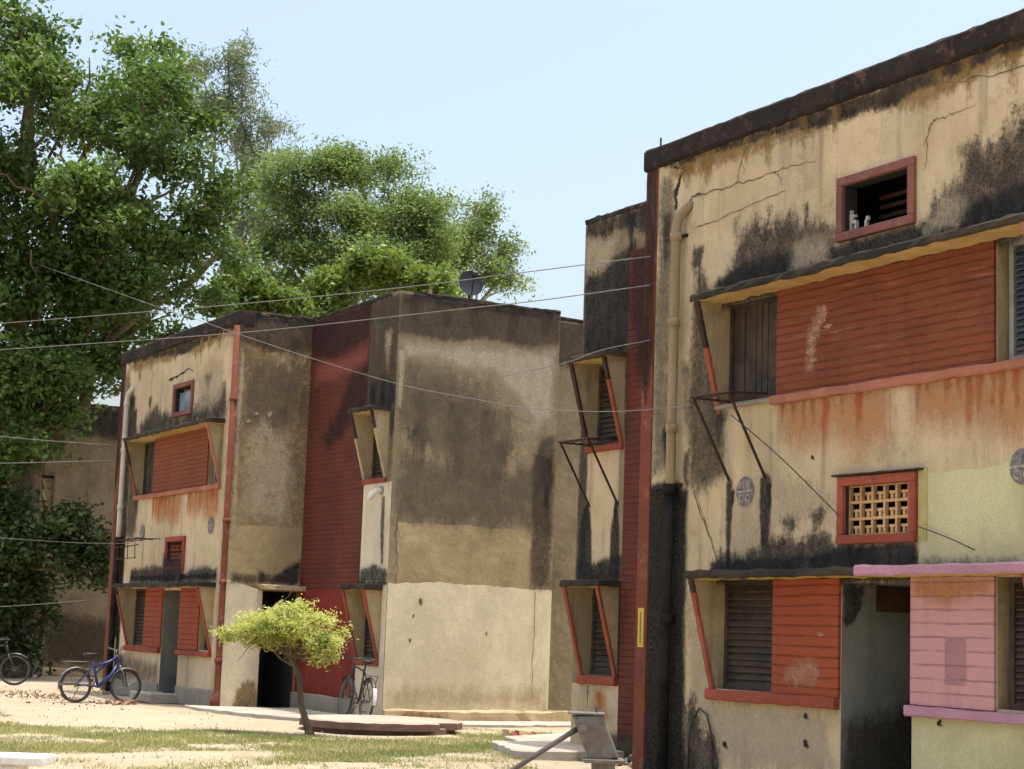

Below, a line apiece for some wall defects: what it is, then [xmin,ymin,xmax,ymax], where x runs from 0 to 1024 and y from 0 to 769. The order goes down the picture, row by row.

crack [923,106,972,165]
crack [674,142,815,228]
water stain [72,37,1024,691]
peeling [806,305,832,371]
corrosion [781,391,884,443]
corrosion [152,490,218,521]
water stain [644,305,974,769]